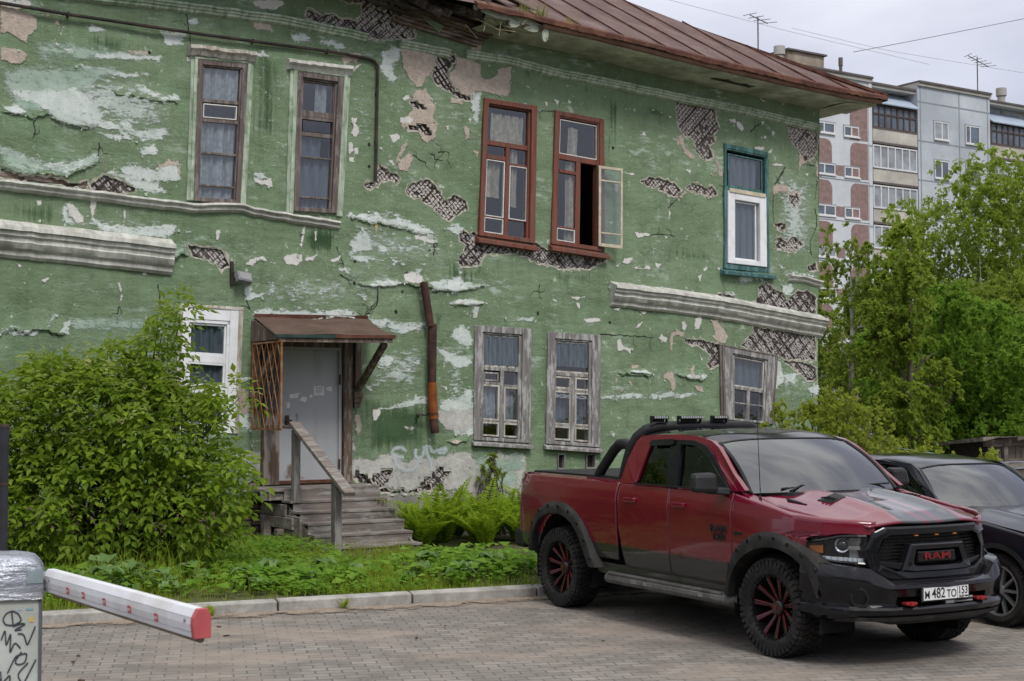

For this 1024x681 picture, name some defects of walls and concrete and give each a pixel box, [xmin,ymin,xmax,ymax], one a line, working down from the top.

peeling [0,0,230,274]
flaking render [244,0,661,495]
spalling [625,102,745,220]
peeling [716,121,819,314]
spalling [740,326,819,396]